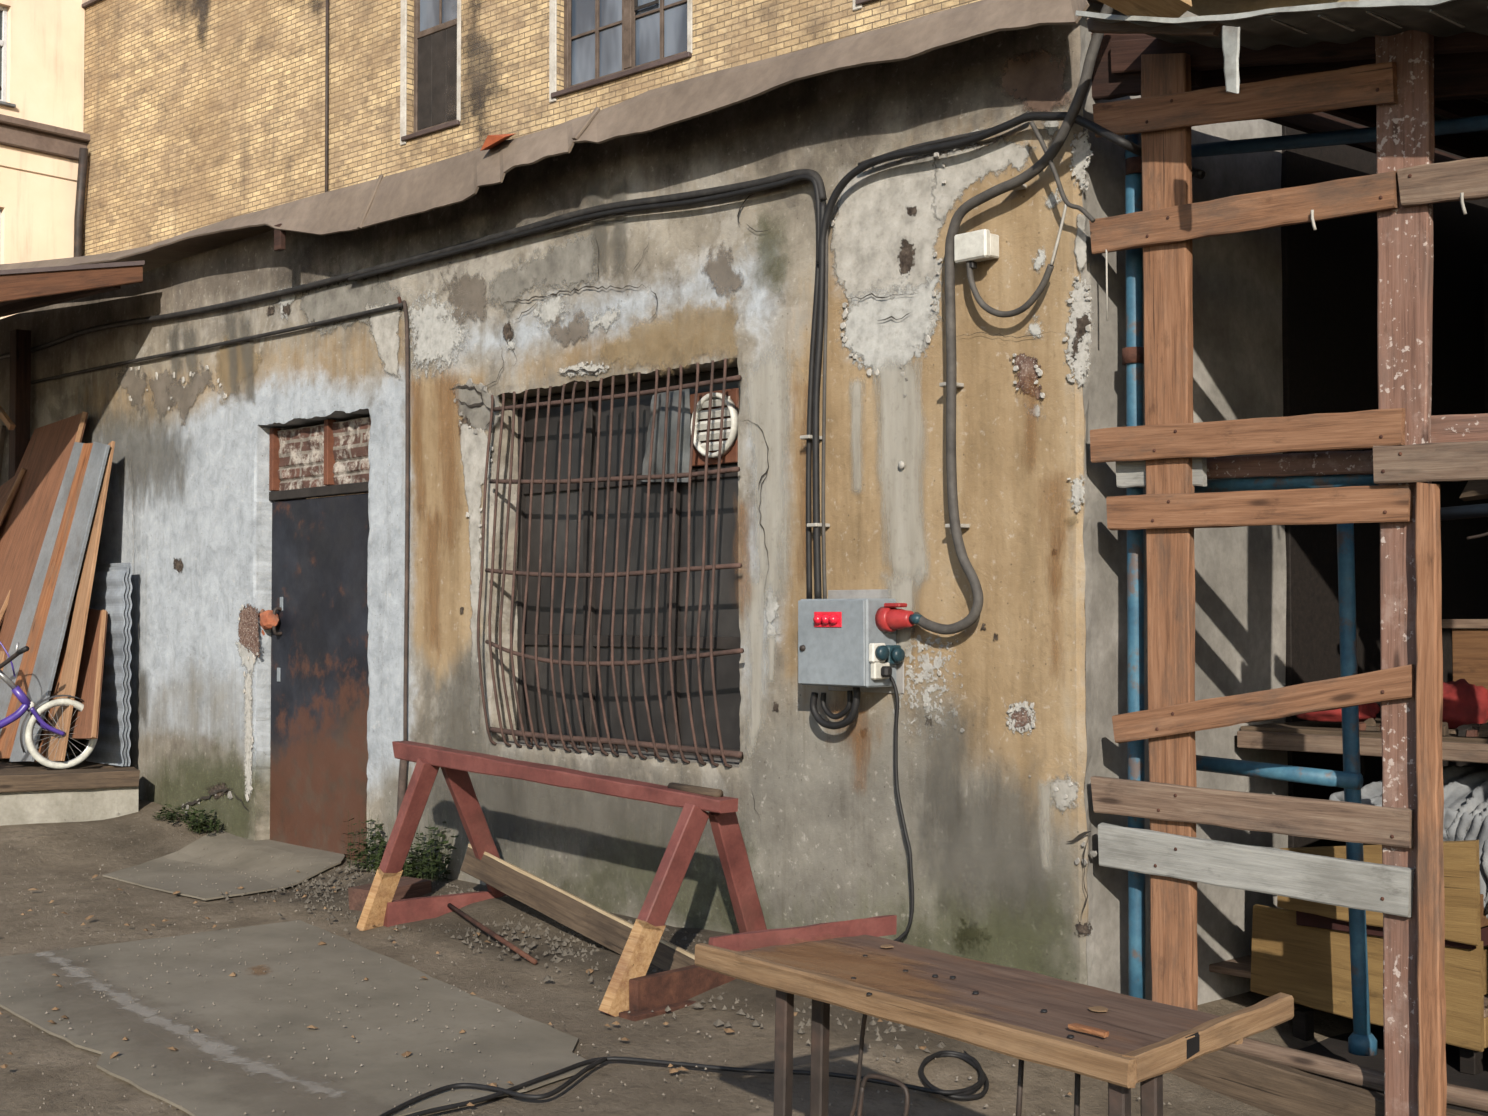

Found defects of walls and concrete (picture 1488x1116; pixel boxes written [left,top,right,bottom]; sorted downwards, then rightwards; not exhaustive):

damp [196,0,206,40]
flaking render [702,240,744,296]
flaking render [830,49,1095,417]
flaking render [235,603,280,802]
peeling [893,626,965,739]
flaking render [1006,698,1036,735]